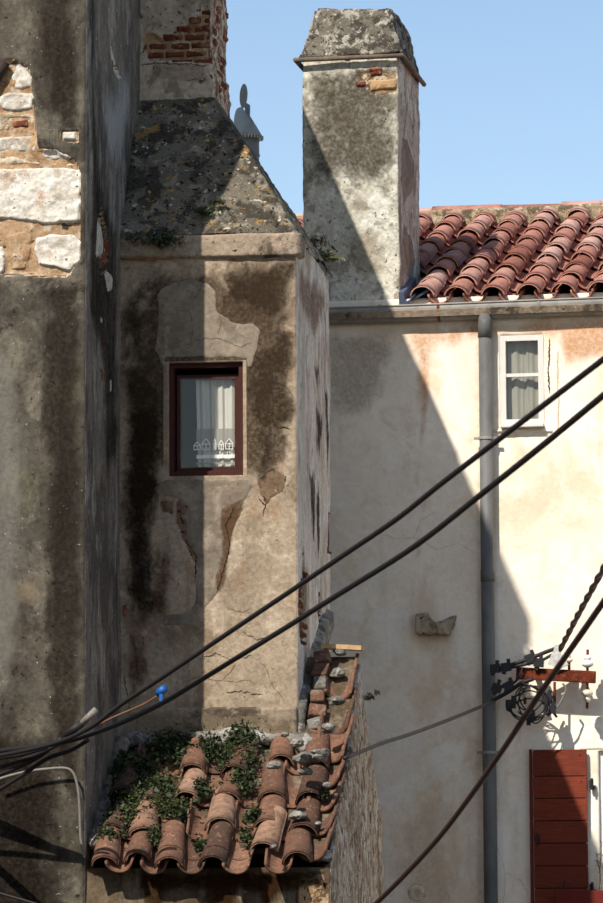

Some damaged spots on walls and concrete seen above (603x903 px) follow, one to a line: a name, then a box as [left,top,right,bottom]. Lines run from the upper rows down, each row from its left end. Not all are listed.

flaking render [143,0,229,93]
flaking render [0,59,82,278]
flaking render [356,63,420,206]
leakage [91,88,168,619]
flaking render [258,469,286,505]
flaking render [160,500,197,572]
leakage [0,288,78,903]
flaking render [298,549,309,646]
flaking render [299,873,329,903]